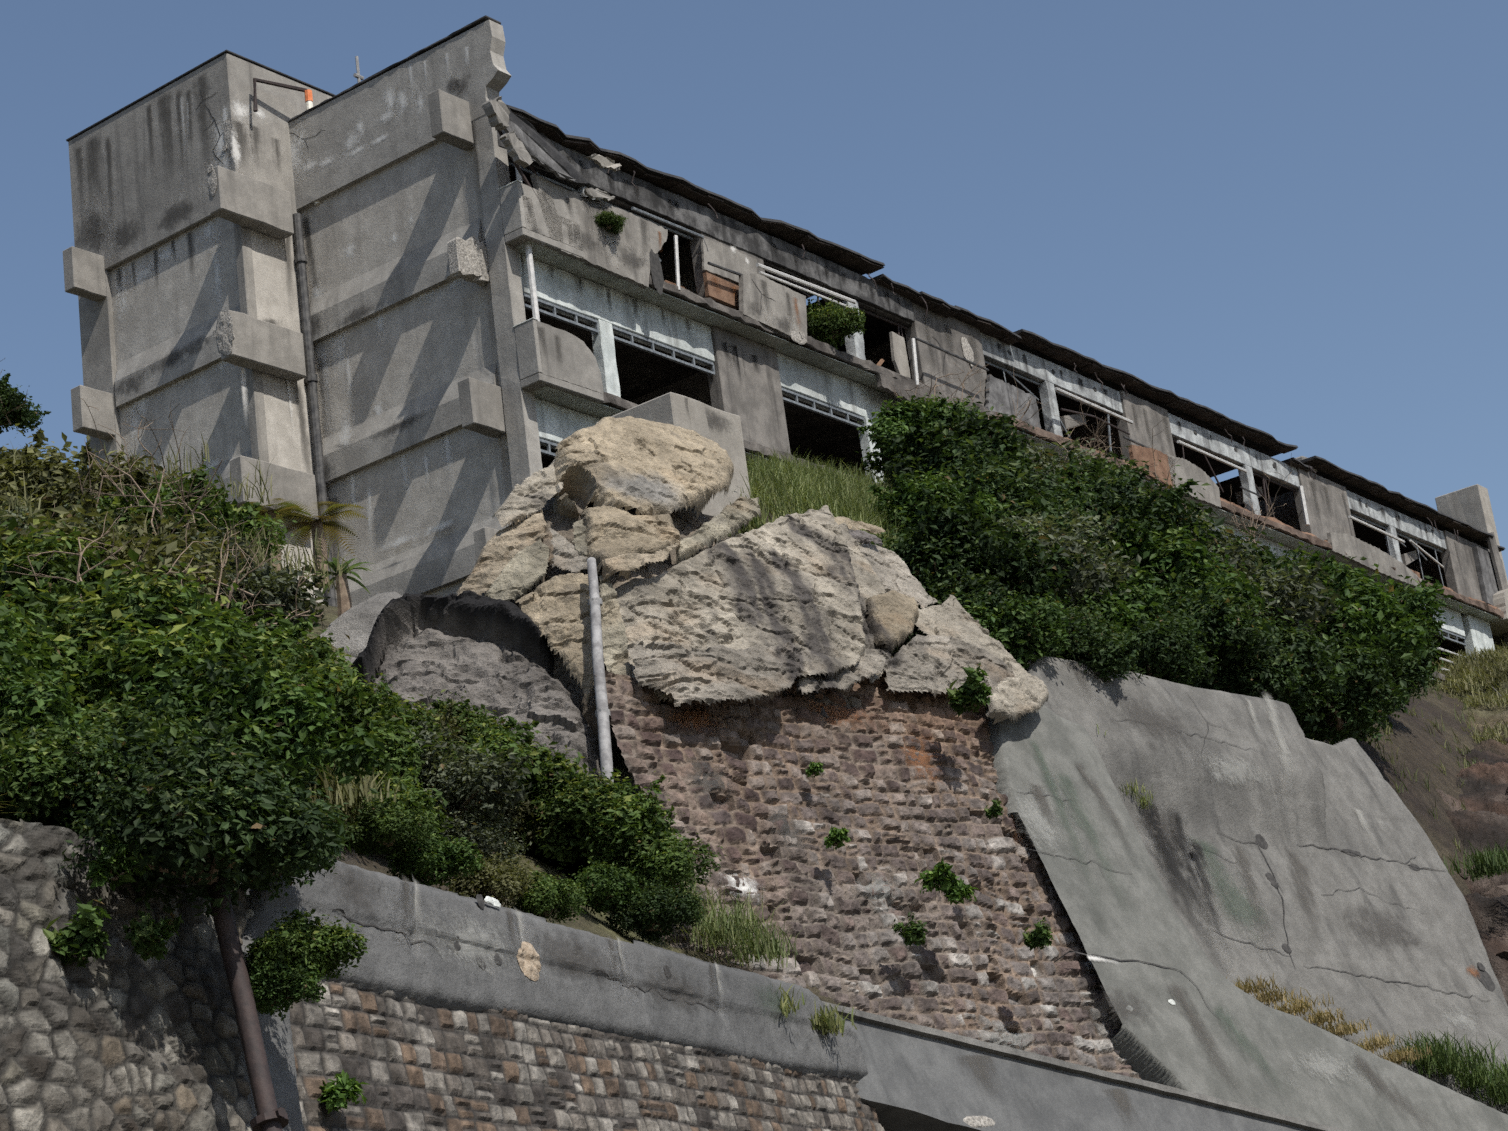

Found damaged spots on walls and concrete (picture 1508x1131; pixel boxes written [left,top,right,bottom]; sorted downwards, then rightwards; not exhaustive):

water stain [76,139,111,181]
water stain [147,77,264,169]
crack [196,89,223,163]
water stain [115,204,214,311]
water stain [1146,804,1215,911]
crack [1186,832,1489,1001]
crack [1051,951,1219,1018]